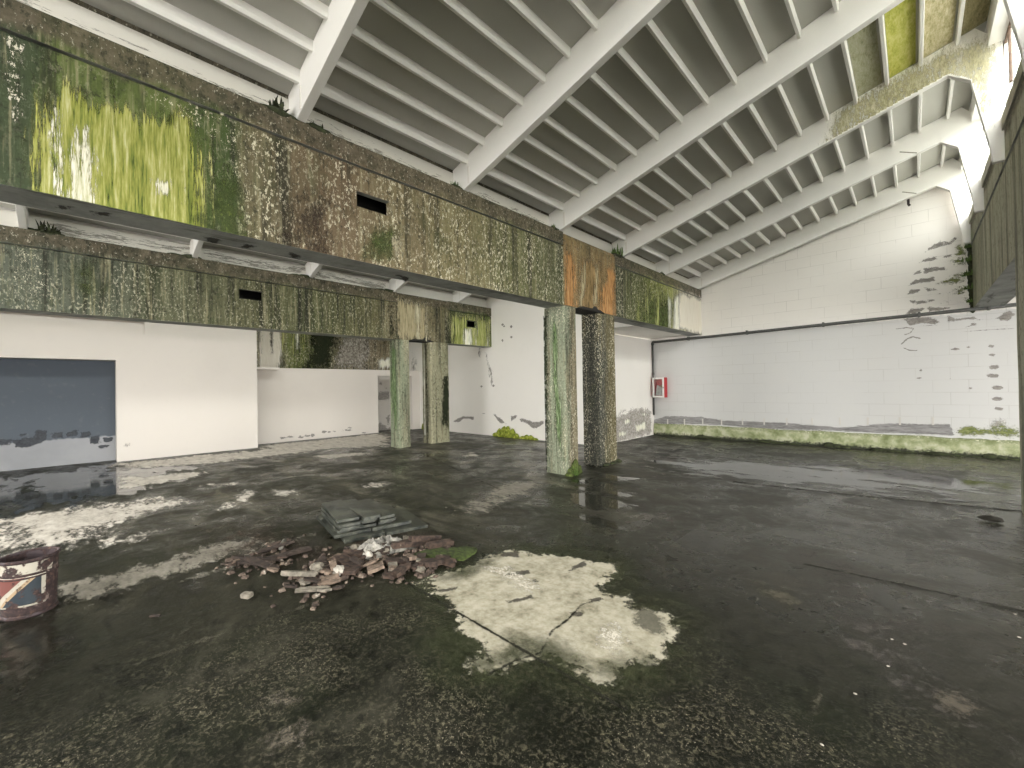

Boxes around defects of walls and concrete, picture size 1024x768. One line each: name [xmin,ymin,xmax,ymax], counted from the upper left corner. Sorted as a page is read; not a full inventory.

damp [48,108,99,203]
damp [150,179,170,195]
damp [152,95,249,176]
rust [564,250,616,315]
peeling [904,237,977,327]
peeling [0,430,113,449]
peeling [453,413,544,428]
peeling [616,407,954,442]
peeling [987,345,1006,428]
crack [403,581,627,710]
damp [418,548,687,688]